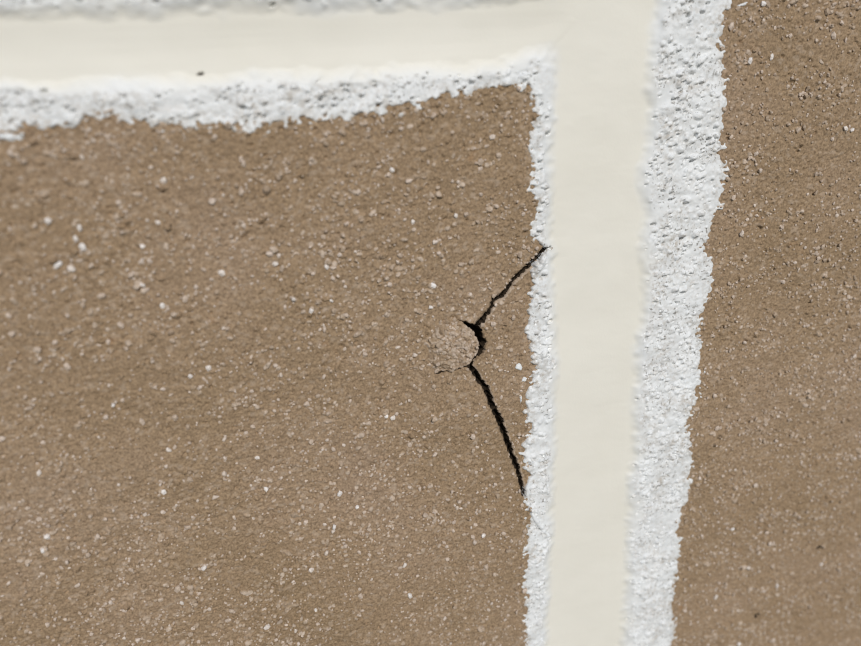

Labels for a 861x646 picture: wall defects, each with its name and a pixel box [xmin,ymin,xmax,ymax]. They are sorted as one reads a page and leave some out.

crack [436,247,549,496]